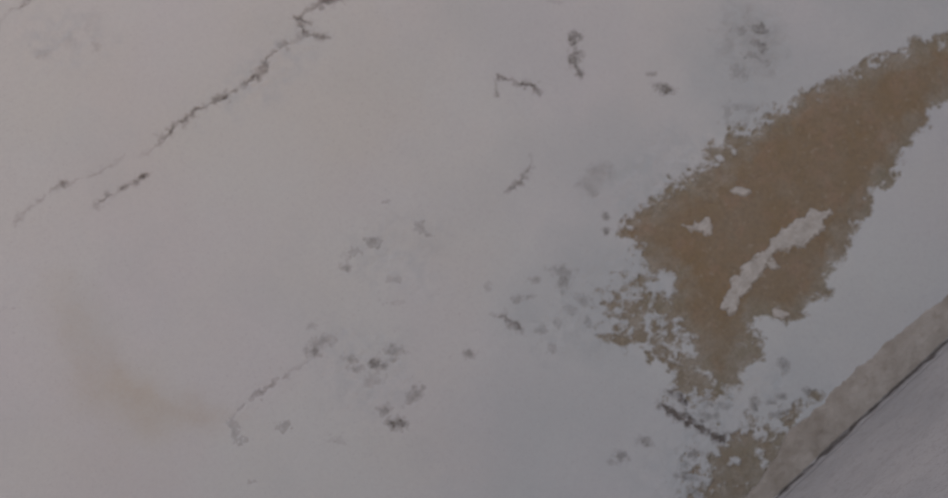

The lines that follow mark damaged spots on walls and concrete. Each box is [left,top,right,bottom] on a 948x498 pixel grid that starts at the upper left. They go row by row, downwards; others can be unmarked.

crack [11,0,351,229]
crack [491,72,546,99]
crack [501,152,536,197]
peeling [509,27,948,498]